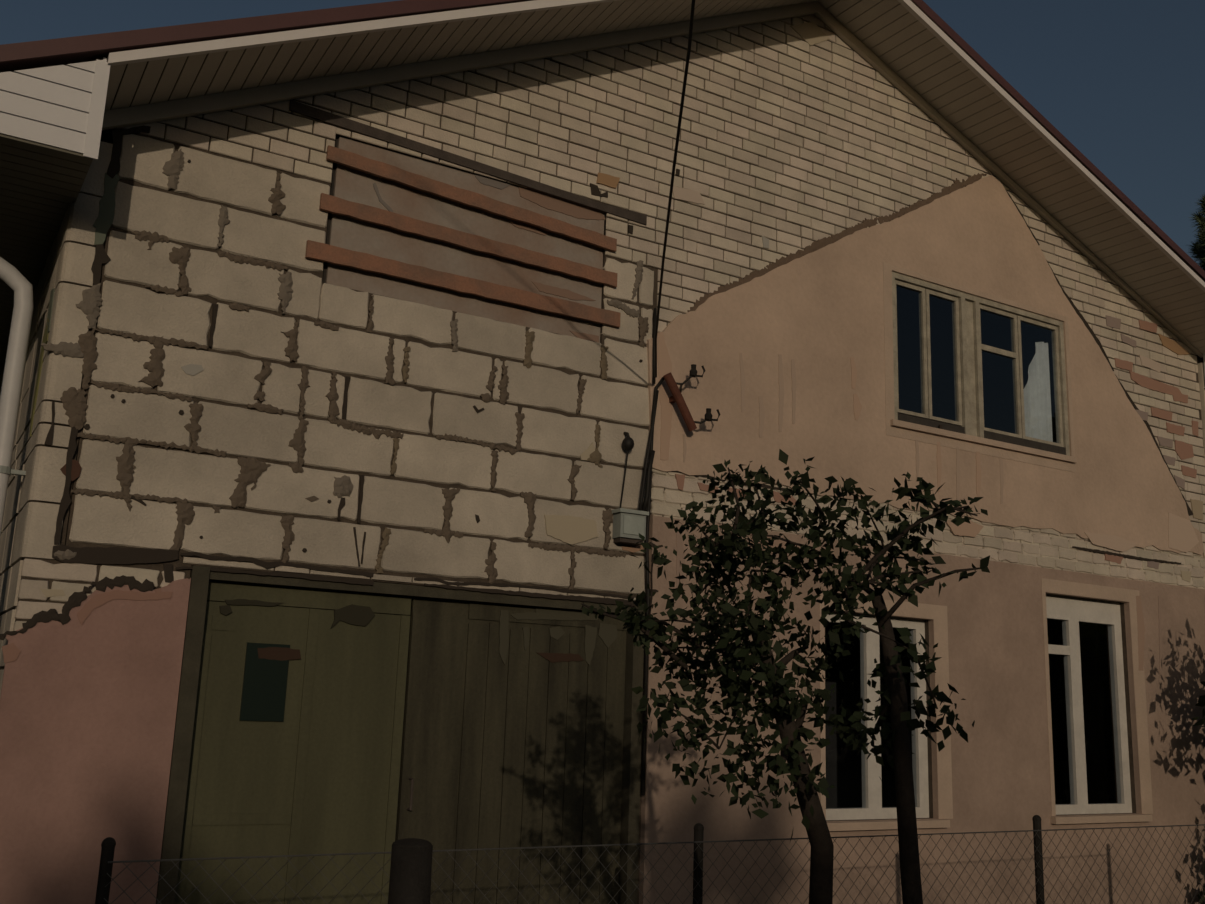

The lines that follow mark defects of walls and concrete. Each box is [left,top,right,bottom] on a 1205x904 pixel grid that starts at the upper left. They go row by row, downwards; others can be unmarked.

peeling [1105,315,1198,489]
peeling [675,474,747,498]
peeling [773,491,796,505]
peeling [946,519,984,537]
spalling [0,575,157,640]